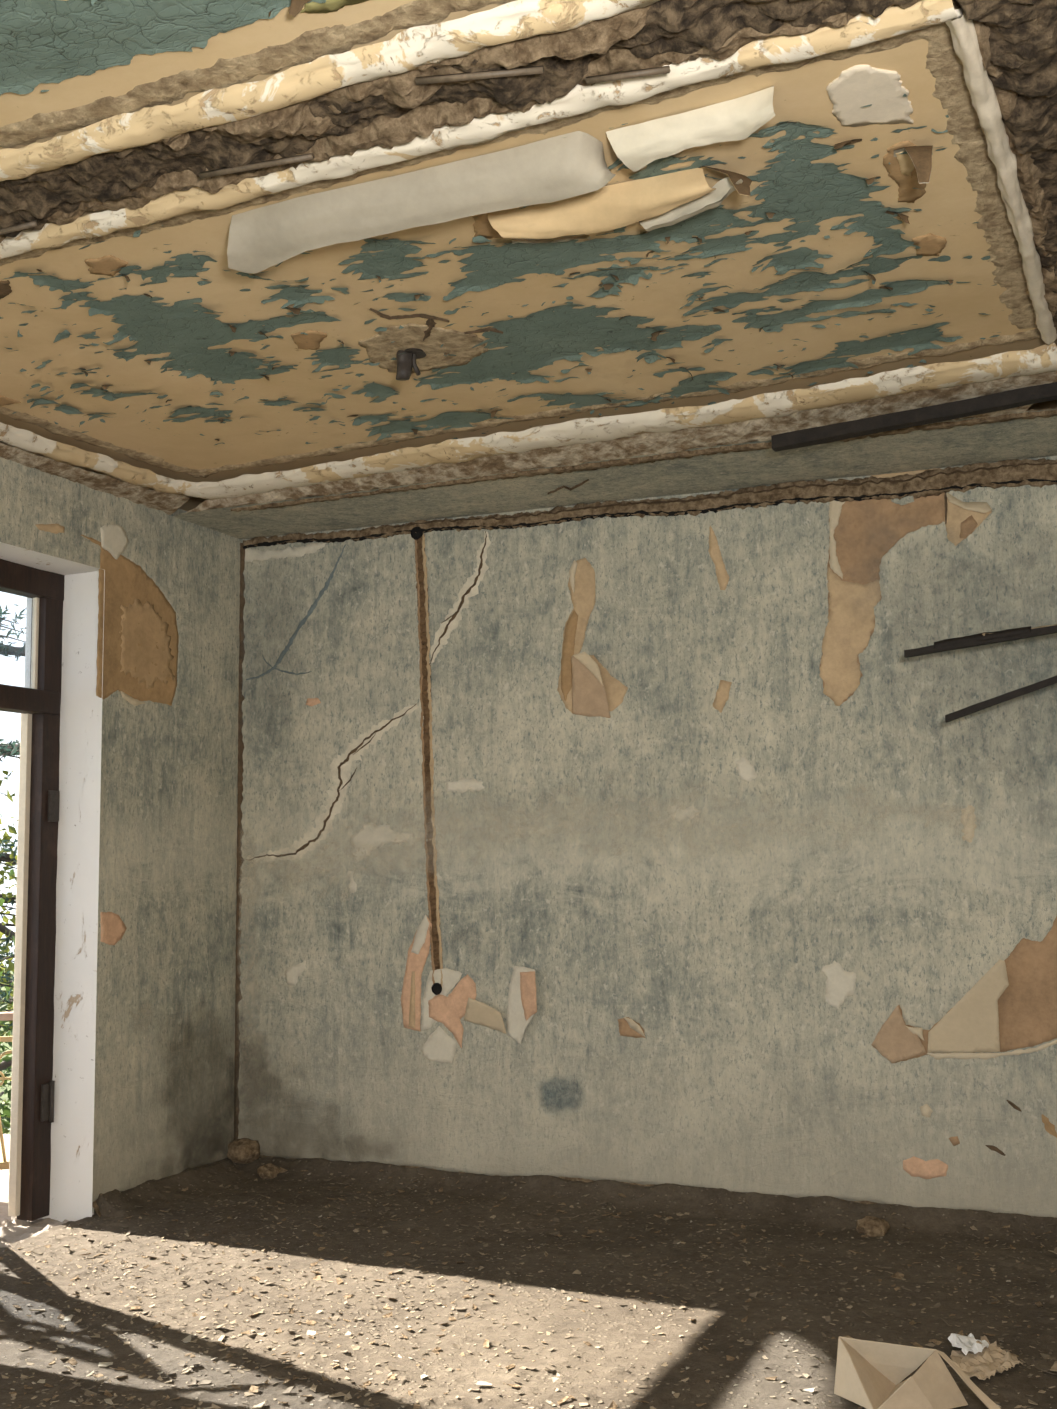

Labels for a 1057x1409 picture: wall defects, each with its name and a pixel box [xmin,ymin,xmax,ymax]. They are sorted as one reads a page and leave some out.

spalling [0,0,921,243]
peeling [0,65,997,448]
spalling [956,0,1057,346]
peeling [81,524,179,706]
crack [429,531,491,664]
spalling [231,442,772,512]
spalling [825,408,1057,444]
crack [234,543,419,1140]
spalling [243,458,1057,1063]